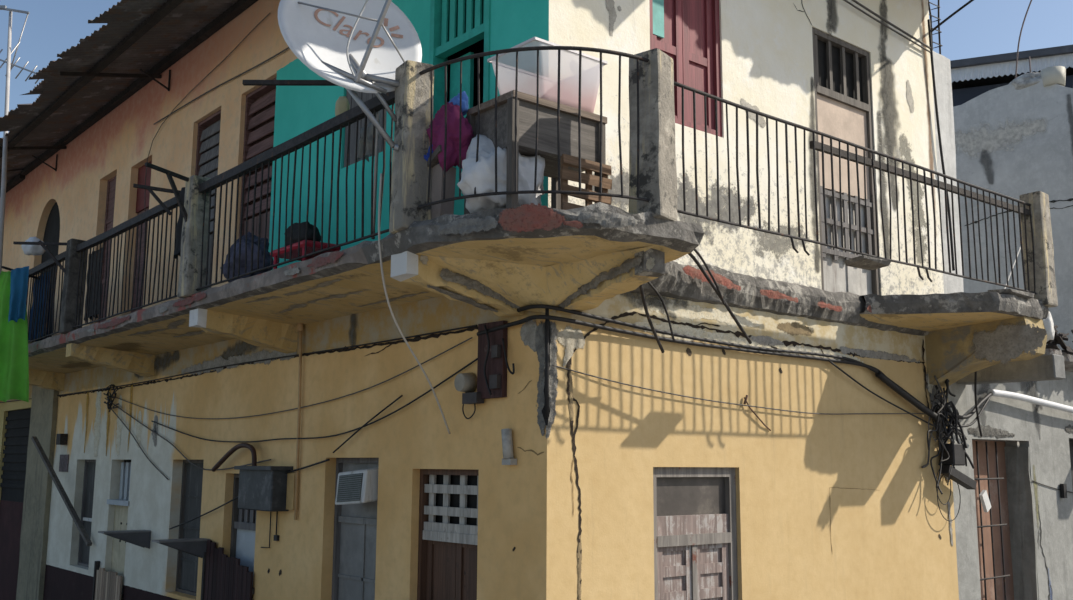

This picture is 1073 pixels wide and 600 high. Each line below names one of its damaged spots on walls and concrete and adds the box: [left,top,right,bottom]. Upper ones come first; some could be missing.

peeling [606,0,622,36]
leakage [827,0,838,32]
leakage [877,0,928,272]
flaking render [437,203,640,236]
spalling [247,268,520,313]
peeling [558,249,863,363]
peeling [971,322,1047,364]
spalling [520,319,585,439]
crack [566,311,931,600]